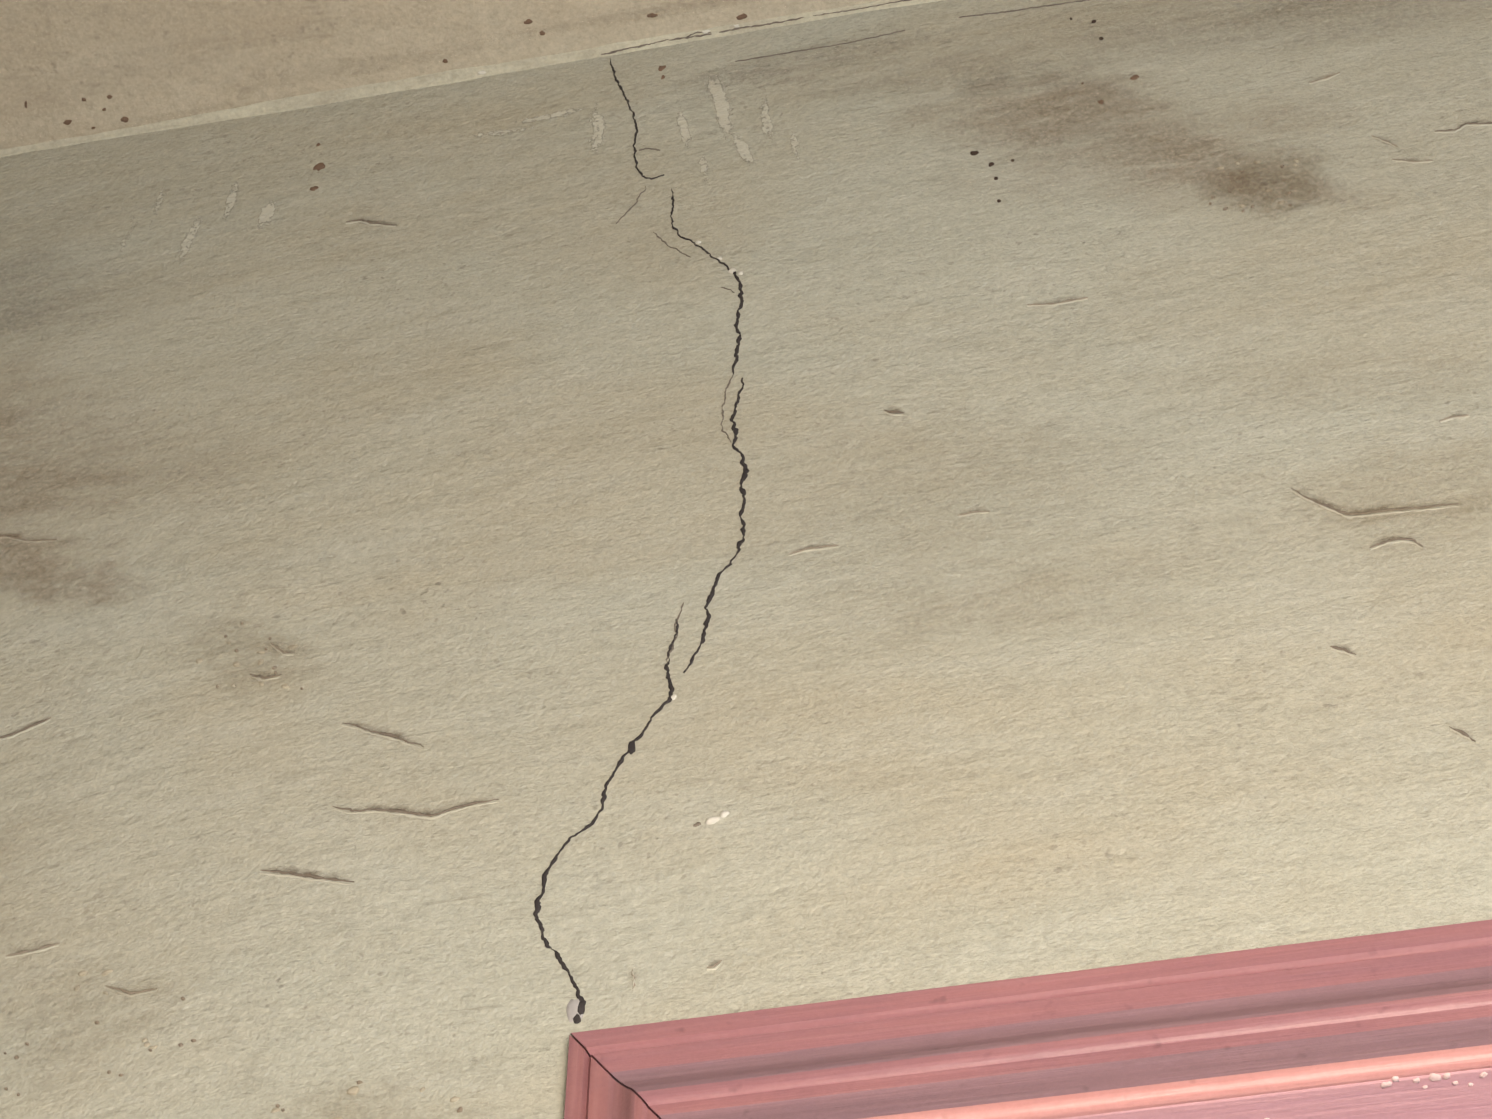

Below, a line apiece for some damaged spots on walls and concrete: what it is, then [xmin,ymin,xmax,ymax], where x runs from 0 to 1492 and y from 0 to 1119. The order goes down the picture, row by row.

crack [533,0,911,1024]
crack [959,0,1090,18]